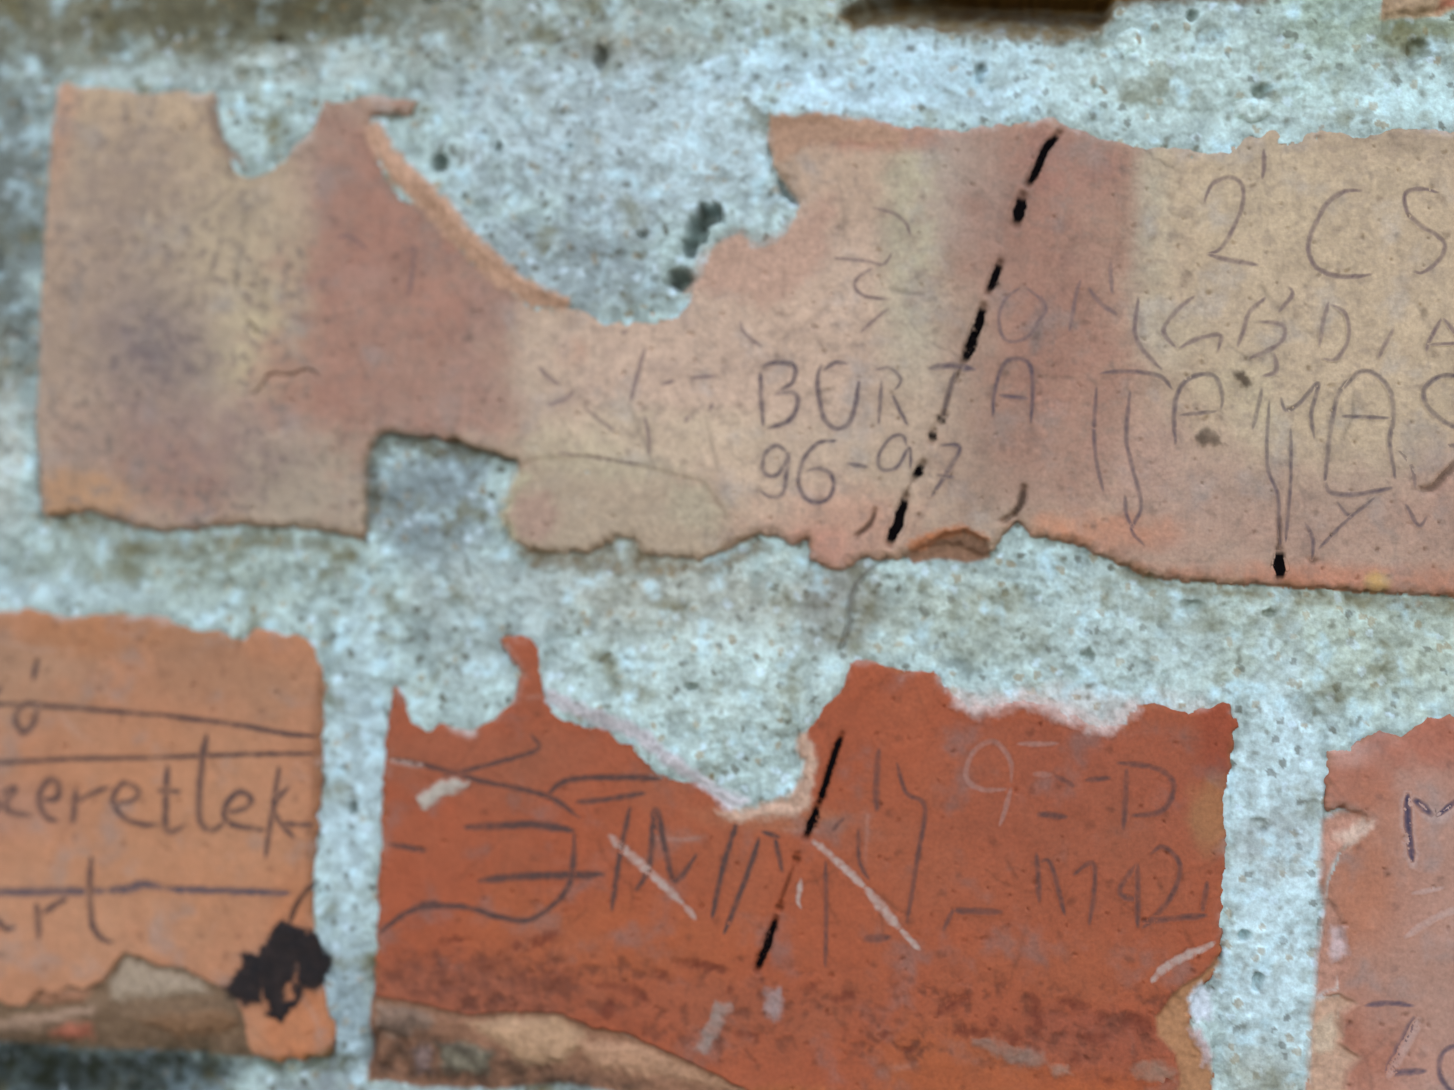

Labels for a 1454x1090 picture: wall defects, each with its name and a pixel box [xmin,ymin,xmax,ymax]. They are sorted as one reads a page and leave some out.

spalling [203,79,321,173]
spalling [360,68,910,322]
crack [1008,132,1061,225]
crack [840,262,1003,648]
crack [1001,488,1028,523]
spalling [543,635,843,826]
crack [754,734,844,971]
spalling [0,949,249,1041]
spalling [436,1017,746,1090]